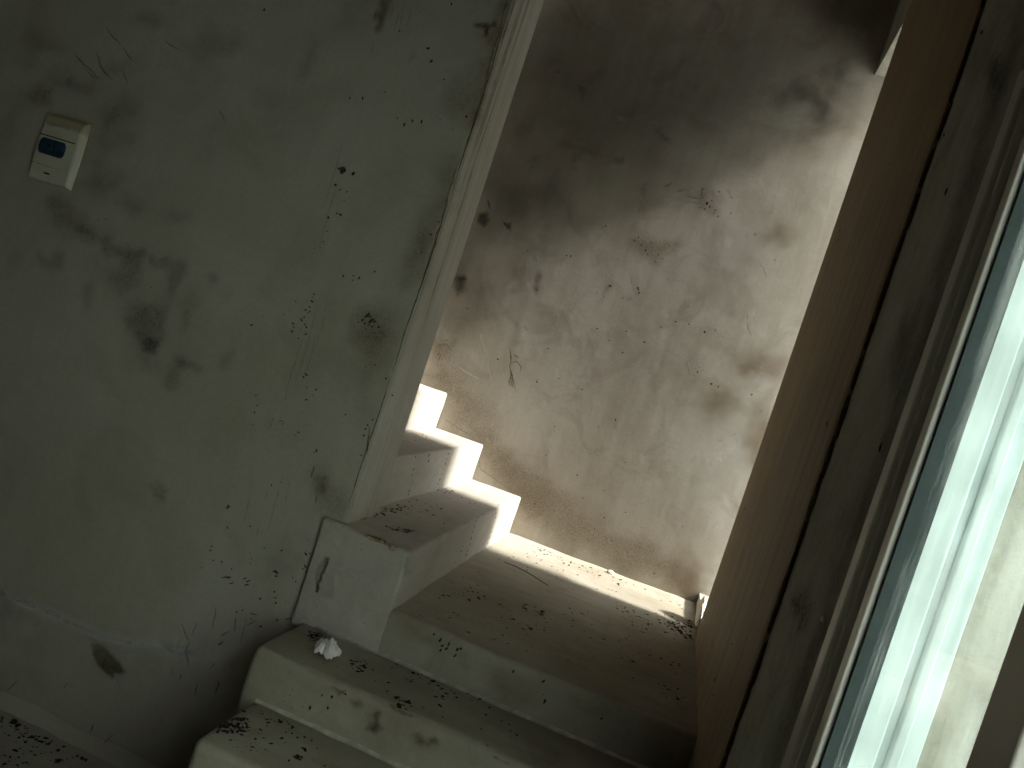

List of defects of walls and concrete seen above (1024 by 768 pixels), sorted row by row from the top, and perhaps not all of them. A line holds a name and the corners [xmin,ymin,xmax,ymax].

damp [93,645,123,676]